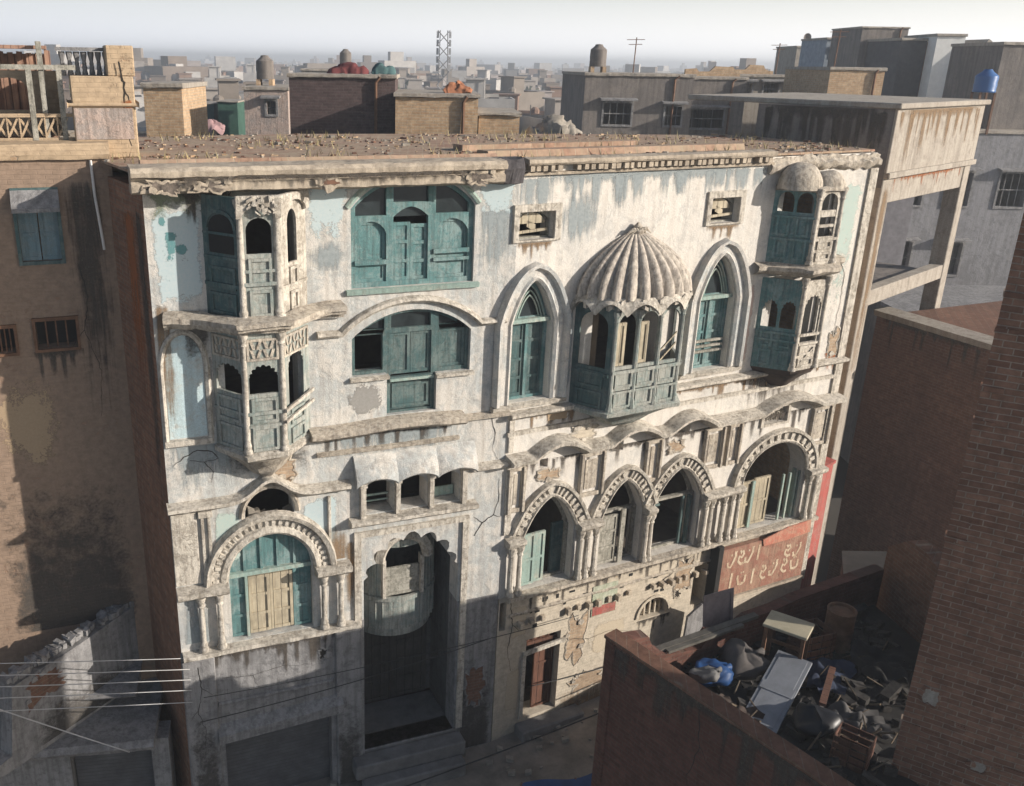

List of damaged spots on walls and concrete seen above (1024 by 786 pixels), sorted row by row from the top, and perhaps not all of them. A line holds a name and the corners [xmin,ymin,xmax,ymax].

corrosion [894,167,961,184]
water stain [520,167,765,239]
peeling [140,177,233,304]
water stain [35,183,110,376]
peeling [348,381,382,414]
crack [177,450,218,483]
spalling [275,455,299,482]
spalling [563,610,624,694]
spalling [463,664,487,708]